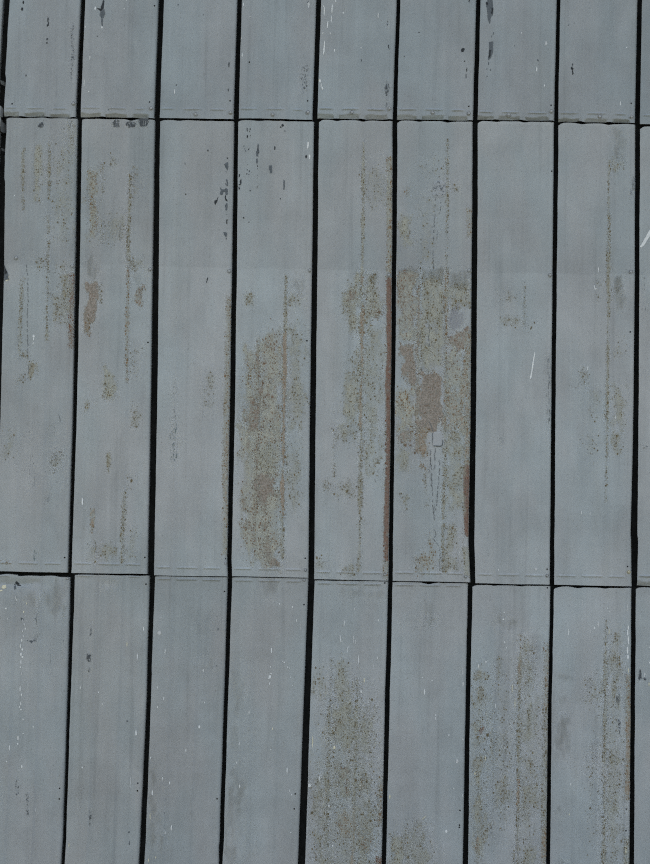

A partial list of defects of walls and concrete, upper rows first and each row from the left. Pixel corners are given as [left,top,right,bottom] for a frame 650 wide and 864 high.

rust [15,277,39,383]
rust [21,125,146,400]
rust [204,276,310,574]
rust [323,139,472,580]
rust [308,659,442,864]
rust [469,635,550,864]